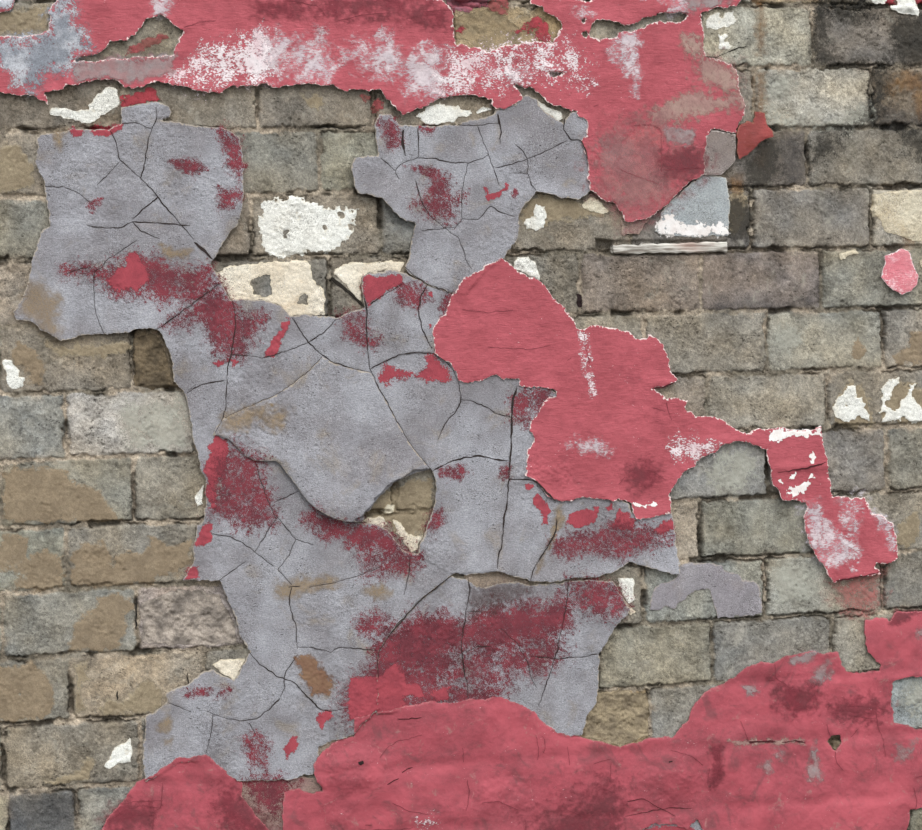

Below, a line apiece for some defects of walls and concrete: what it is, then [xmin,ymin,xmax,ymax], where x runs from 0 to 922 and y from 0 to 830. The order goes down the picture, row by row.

peeling [0,0,15,13]
crack [381,114,588,268]
crack [45,110,217,333]
peeling [881,249,918,295]
spalling [132,334,171,390]
crack [187,267,557,578]
peeling [665,438,714,460]
crack [132,598,140,629]
spalling [139,589,238,646]
crack [169,464,597,756]
peeling [807,750,823,781]
peeling [219,792,268,830]